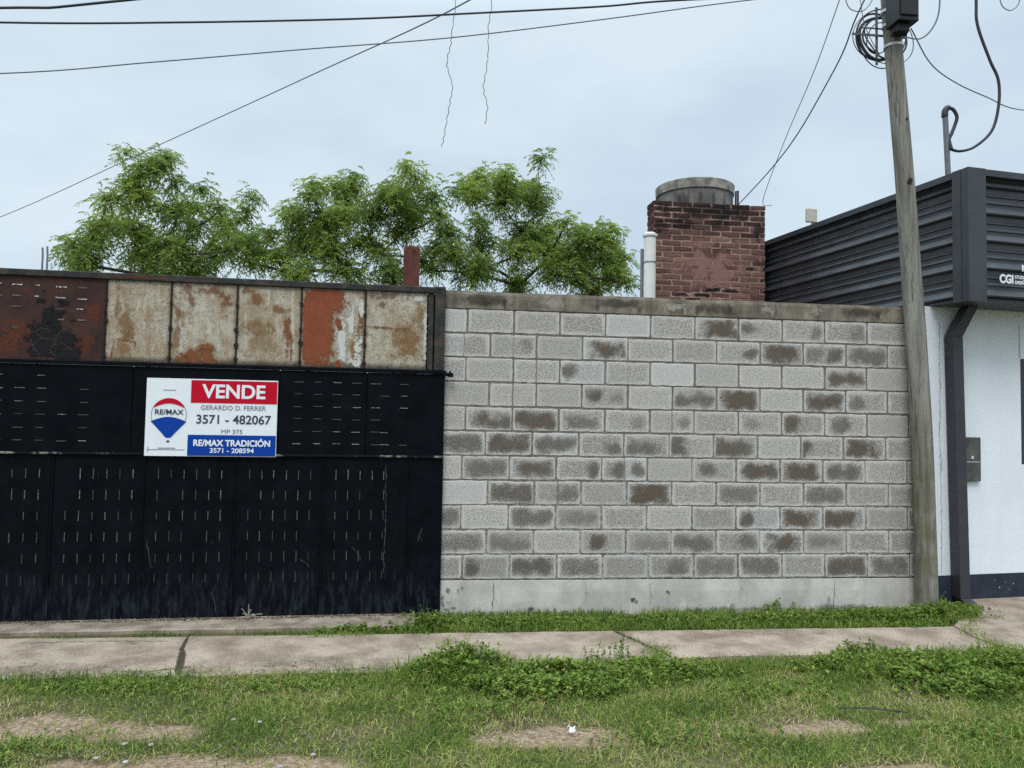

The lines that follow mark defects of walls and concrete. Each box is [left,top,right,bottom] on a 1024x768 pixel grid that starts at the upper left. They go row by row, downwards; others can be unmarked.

corrosion [110,275,170,360]
corrosion [172,284,233,364]
corrosion [242,286,424,367]
peeling [335,299,365,367]
damp [664,304,753,339]
damp [676,390,756,410]
damp [807,349,865,411]
damp [473,410,576,475]
damp [613,464,670,504]
damp [716,438,878,481]
damp [767,510,812,552]
damp [825,511,855,527]